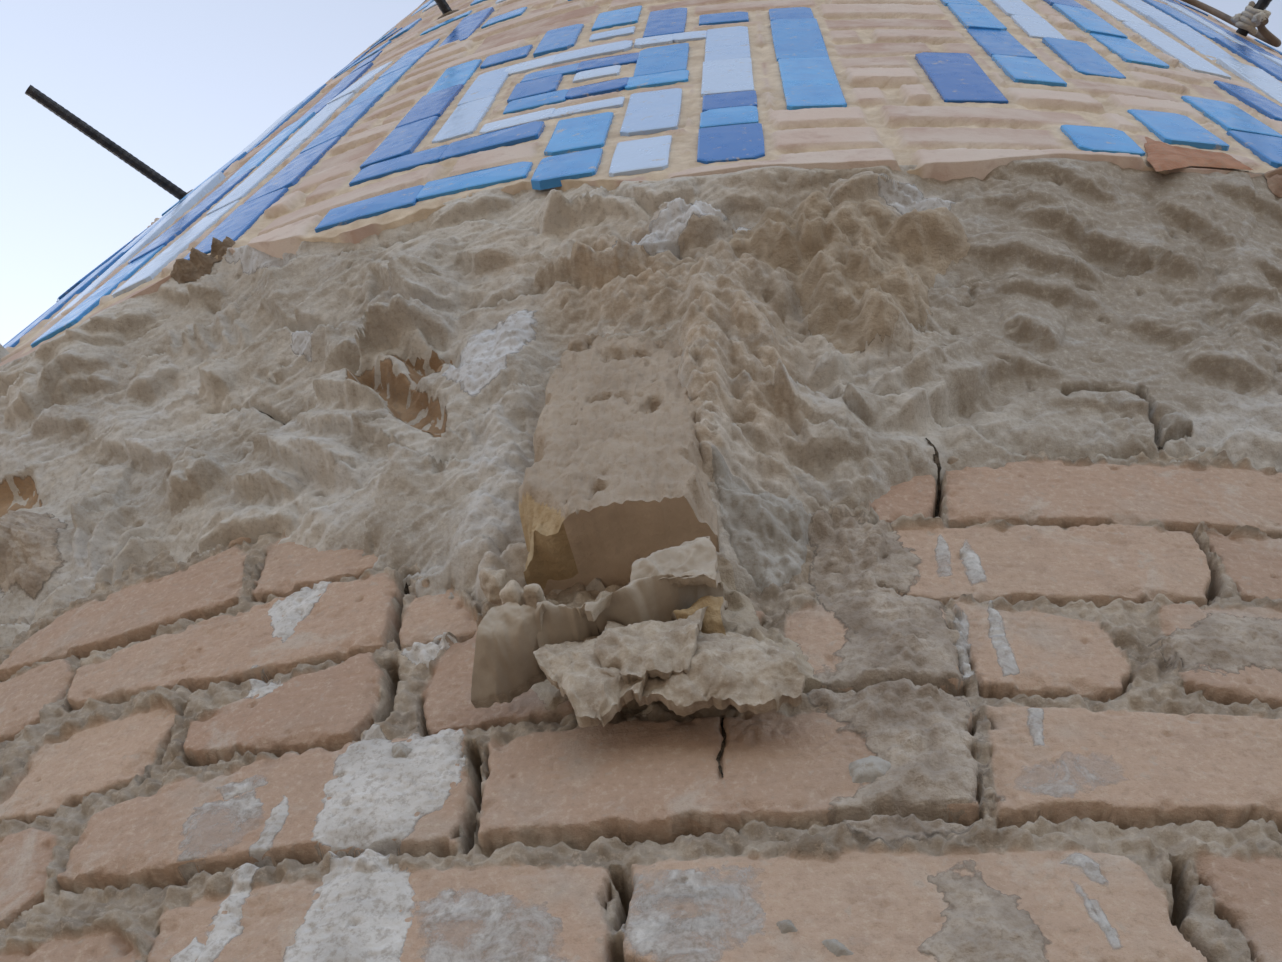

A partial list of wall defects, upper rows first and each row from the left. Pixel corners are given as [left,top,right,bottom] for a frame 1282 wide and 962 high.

spalling [1144,137,1282,198]
spalling [170,236,236,284]
spalling [346,350,457,437]
spalling [0,476,42,517]
crack [925,438,941,517]
peeling [471,536,805,728]
crack [716,718,726,778]